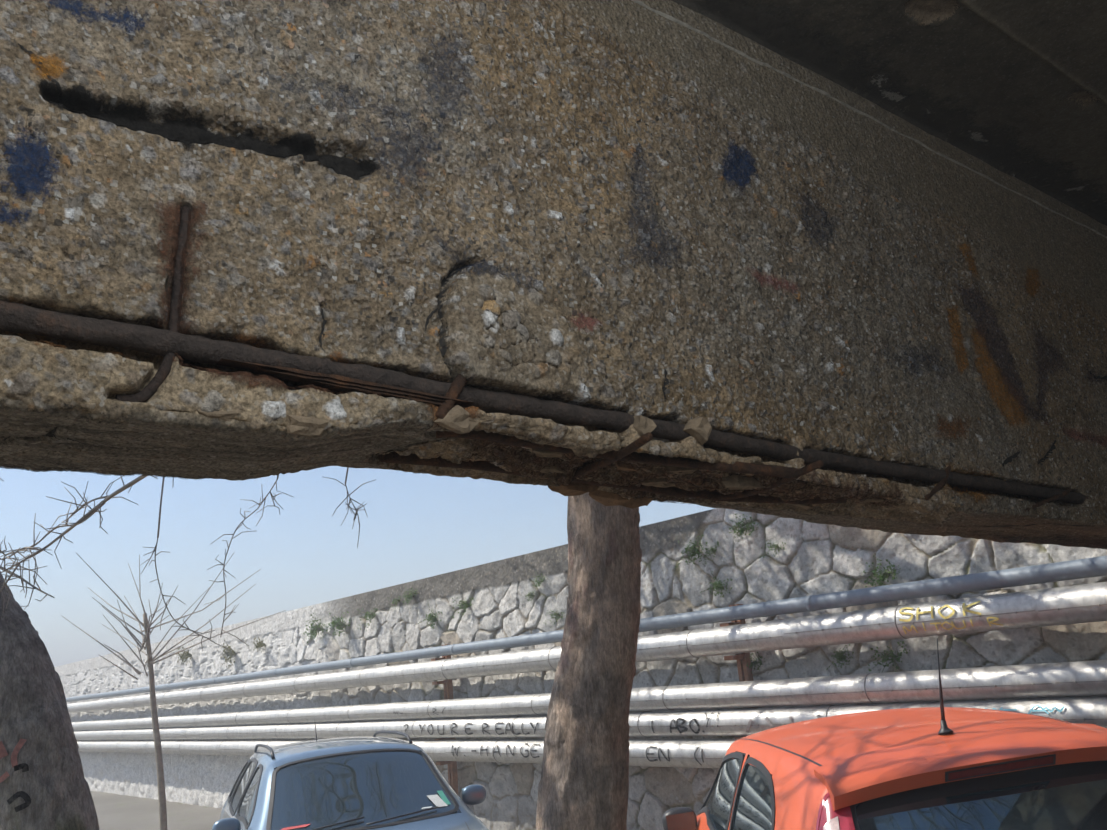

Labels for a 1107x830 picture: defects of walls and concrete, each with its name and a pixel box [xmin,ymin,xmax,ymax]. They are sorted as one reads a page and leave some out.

rust [151,199,210,335]
rust [173,353,345,394]
crack [425,264,474,383]
spalling [0,205,1089,525]
rust [461,439,903,509]